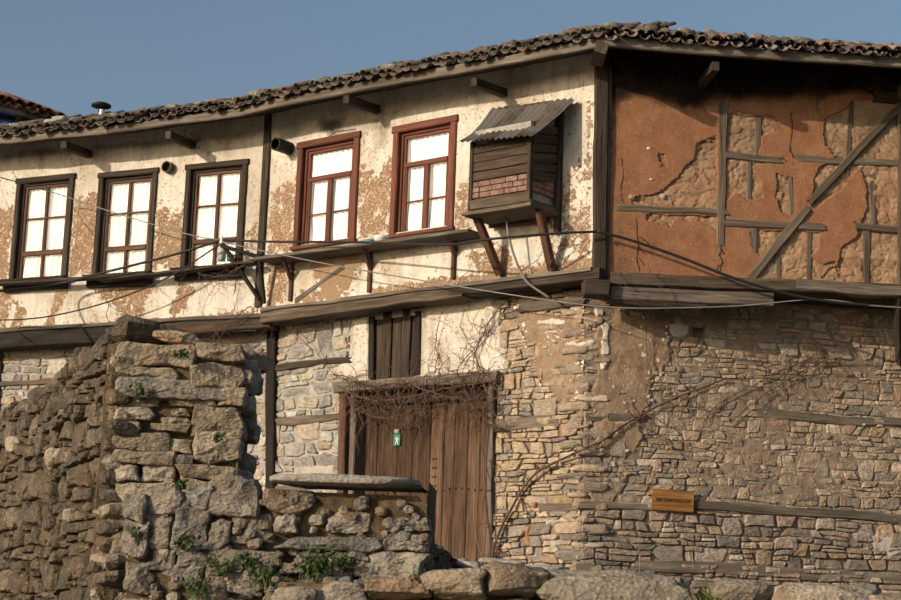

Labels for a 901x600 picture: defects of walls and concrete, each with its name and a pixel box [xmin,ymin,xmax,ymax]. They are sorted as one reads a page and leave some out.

peeling [0,192,98,328]
peeling [89,195,254,323]
peeling [244,100,594,307]
spalling [628,111,780,231]
spalling [757,98,898,284]
peeling [423,298,511,376]
peeling [537,308,617,388]